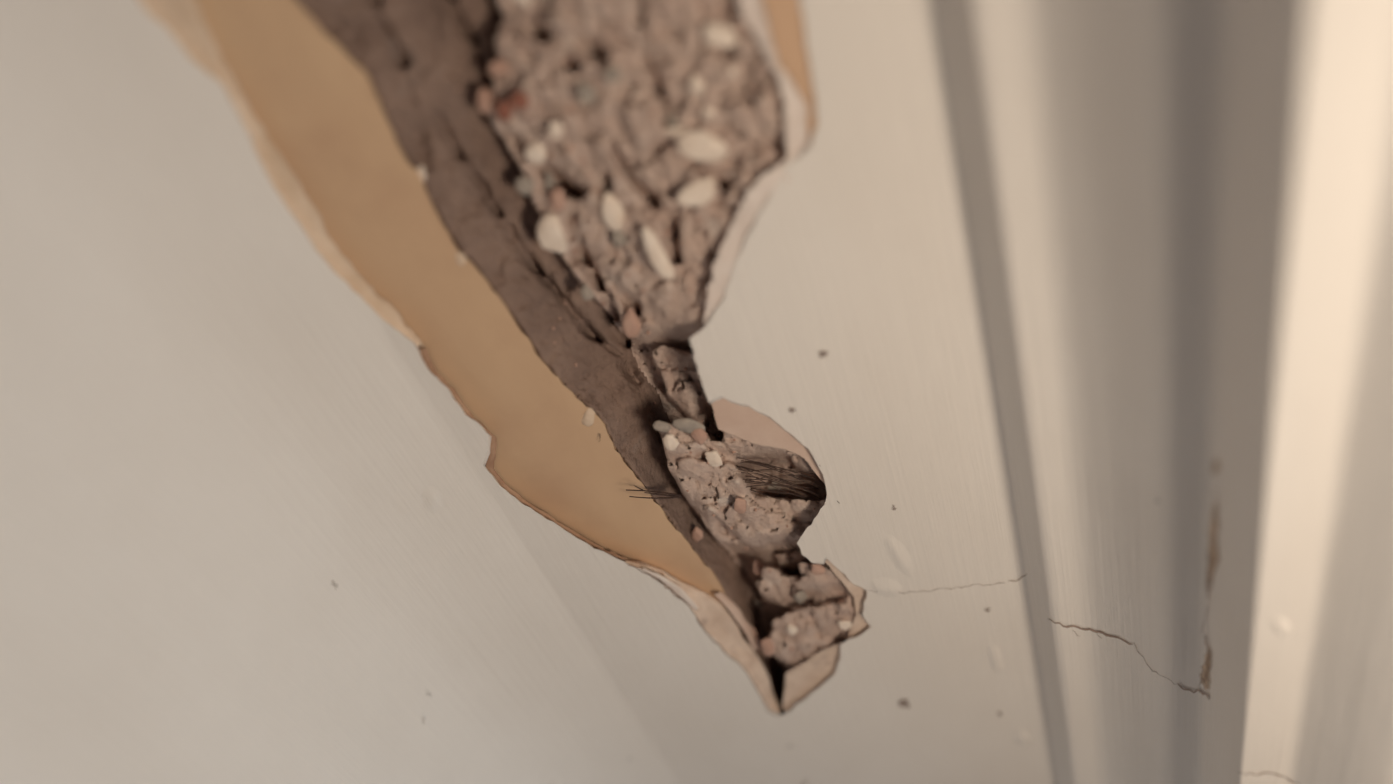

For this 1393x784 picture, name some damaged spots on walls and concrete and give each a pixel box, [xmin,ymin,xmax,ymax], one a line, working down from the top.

flaking render [141,0,871,716]
crack [1049,619,1174,684]